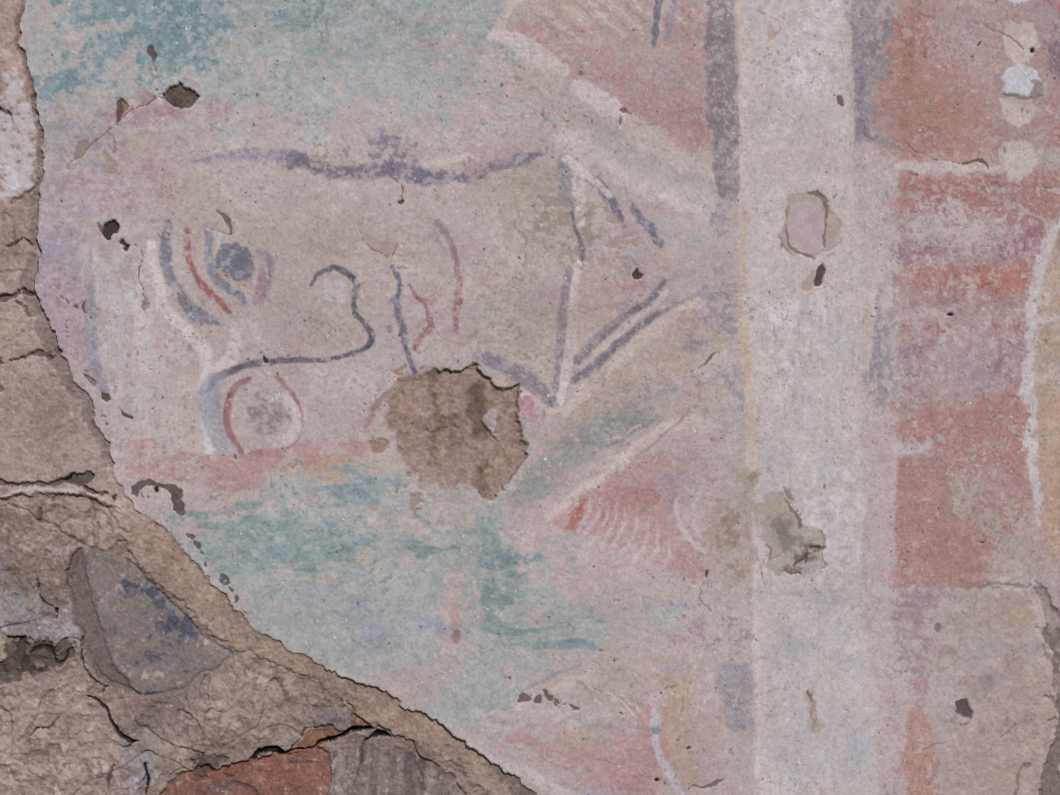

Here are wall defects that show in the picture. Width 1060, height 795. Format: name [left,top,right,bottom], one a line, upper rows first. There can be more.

spalling [786,192,843,292]
spalling [0,0,537,795]
crack [0,470,157,558]
peeling [752,488,827,589]
crack [29,716,59,737]
crack [80,643,150,794]
crack [223,724,390,795]